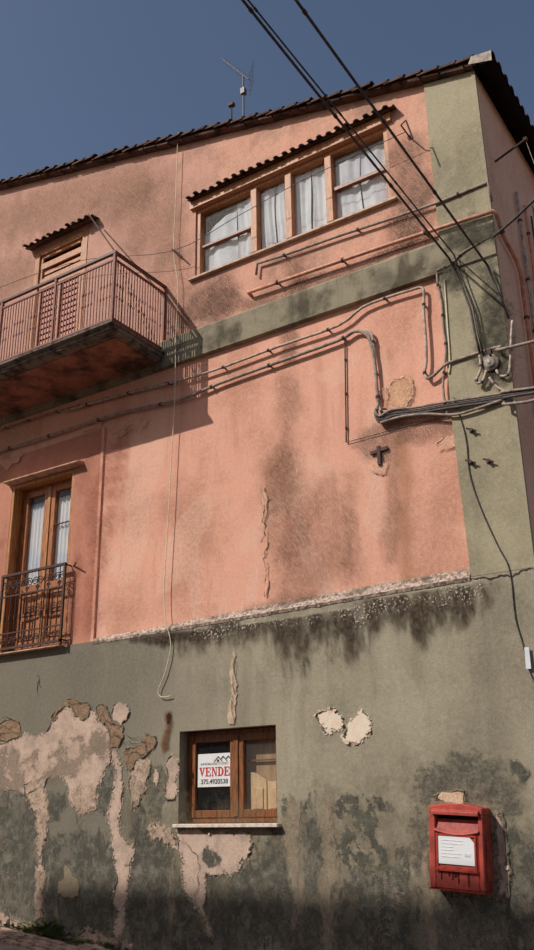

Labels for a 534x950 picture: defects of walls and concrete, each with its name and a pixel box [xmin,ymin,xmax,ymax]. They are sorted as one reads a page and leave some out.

flaking render [379,375,414,409]
crack [260,490,272,593]
water stain [129,572,488,669]
flaking render [0,698,180,816]
water stain [227,652,237,724]
flaking render [313,703,373,745]
flaking render [0,911,46,937]
flaking render [147,818,253,938]
water stain [0,748,534,950]
flaking render [493,810,513,899]